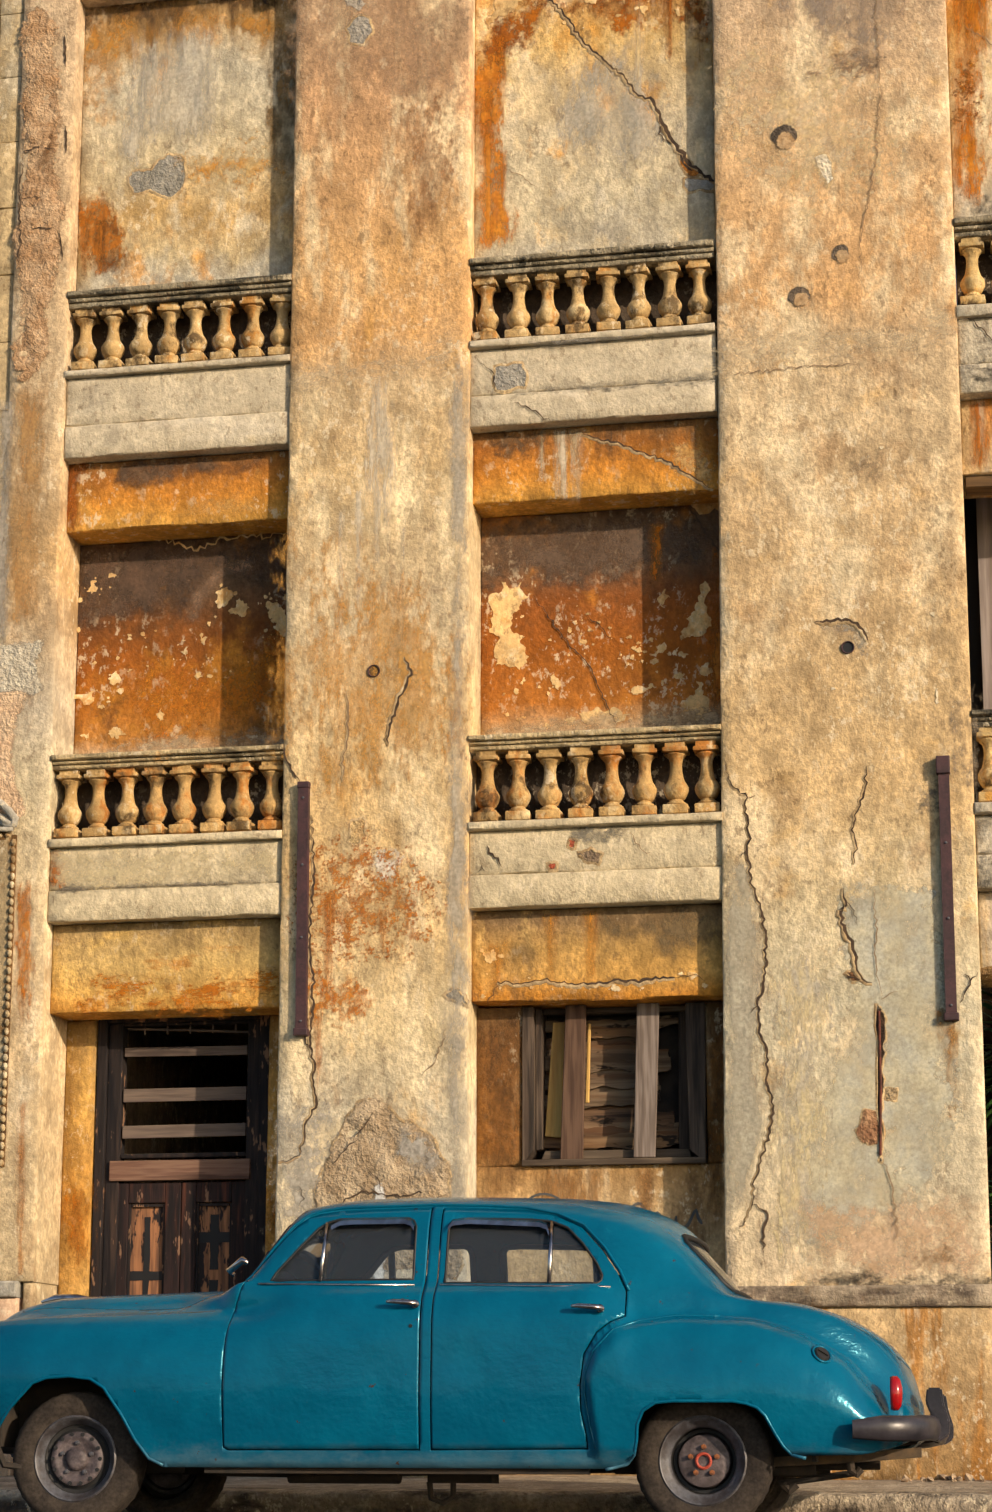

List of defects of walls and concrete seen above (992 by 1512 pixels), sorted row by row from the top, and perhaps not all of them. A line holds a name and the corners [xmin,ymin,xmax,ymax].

flaking render [10,6,66,382]
corrosion [476,0,709,71]
crack [546,0,714,183]
corrosion [954,0,991,199]
peeling [74,627,157,709]
peeling [173,583,286,682]
peeling [485,582,630,731]
peeling [567,581,713,721]
crack [278,815,444,1205]
corrosion [287,830,447,1026]
crack [723,765,775,1252]
crack [835,766,897,999]